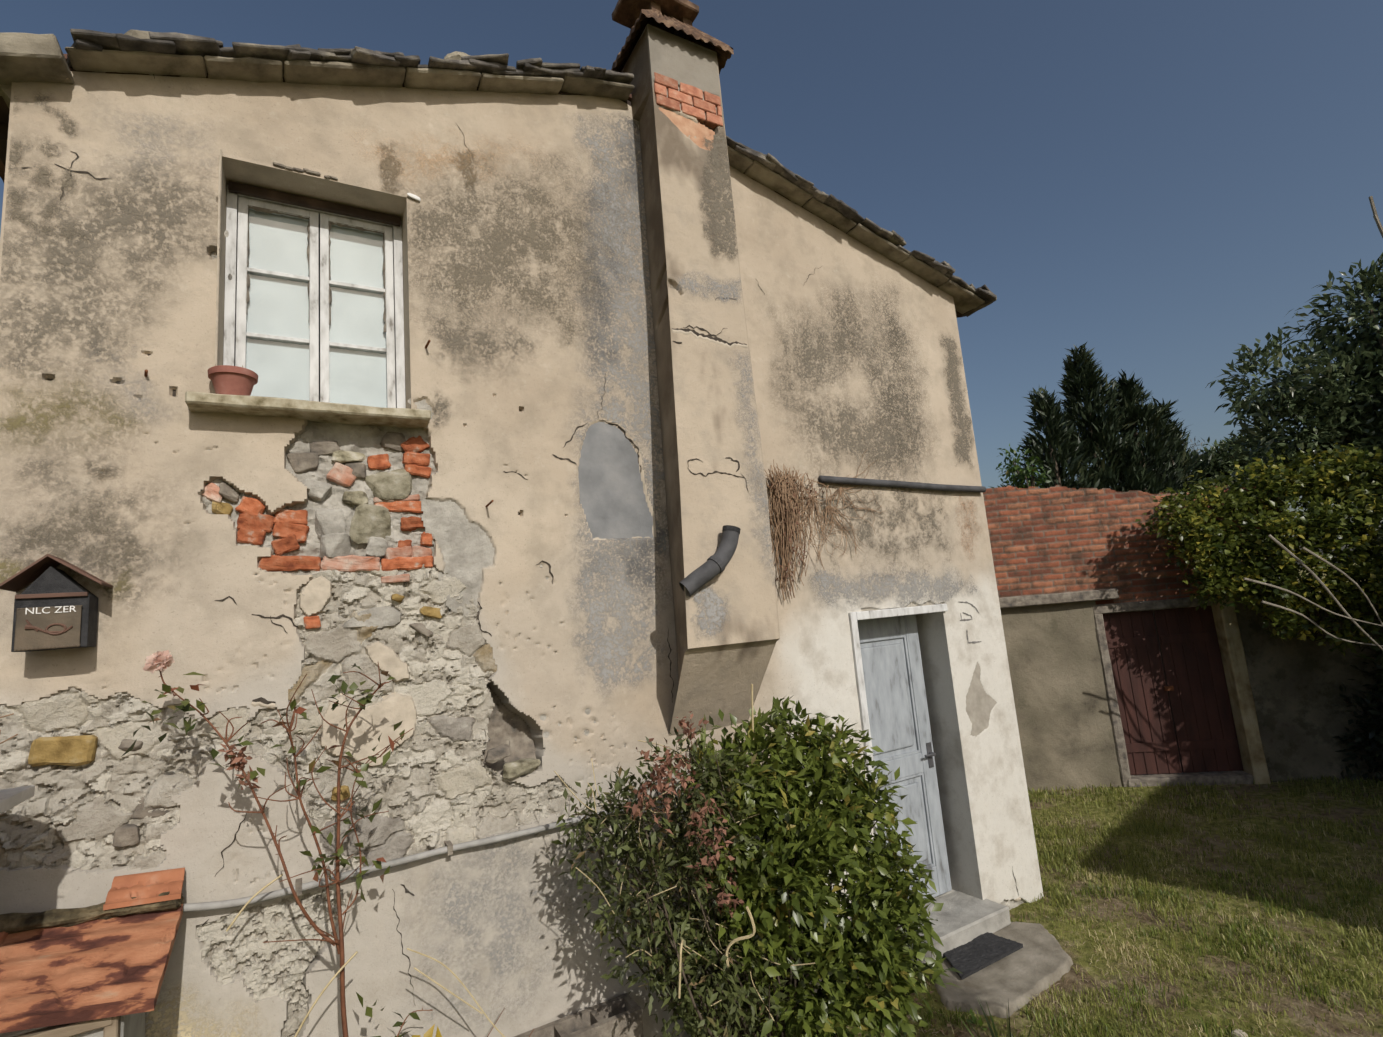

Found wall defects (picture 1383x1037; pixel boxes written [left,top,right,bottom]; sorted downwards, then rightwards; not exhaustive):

flaking render [654,72,723,151]
crack [22,151,108,200]
damp [700,134,738,258]
damp [0,142,210,370]
crack [672,278,765,349]
damp [782,300,920,469]
damp [941,338,972,462]
peeling [578,422,653,539]
crack [688,457,749,493]
spalling [0,398,576,881]
peeling [966,662,997,737]
spalling [196,886,345,1001]